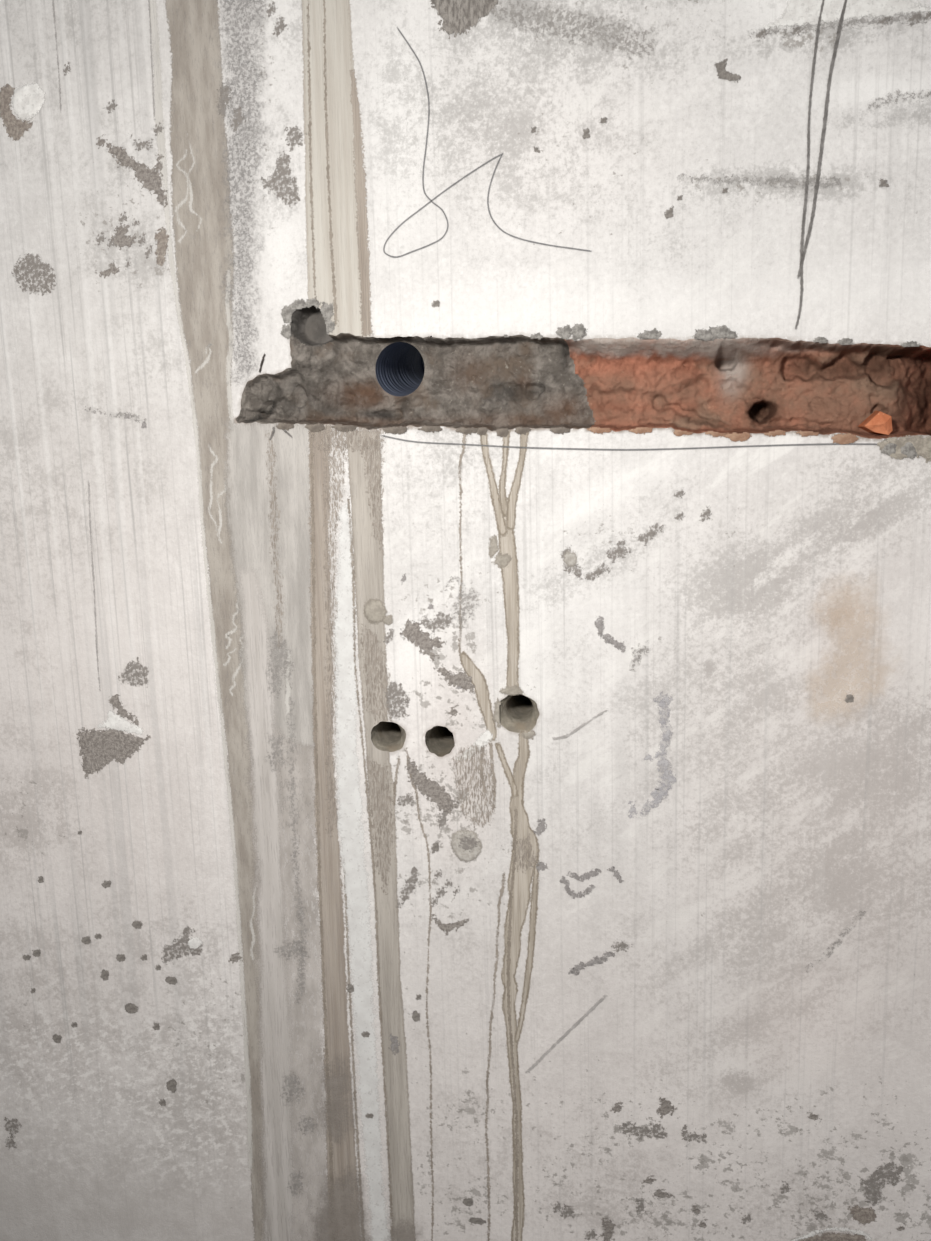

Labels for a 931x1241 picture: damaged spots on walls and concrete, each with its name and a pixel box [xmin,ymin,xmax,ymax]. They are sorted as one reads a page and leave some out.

peeling [431,0,654,59]
peeling [0,83,45,141]
peeling [96,123,169,207]
peeling [94,212,169,279]
peeling [280,298,335,339]
flaking render [530,323,931,459]
peeling [561,491,685,580]
water stain [148,0,434,1241]
peeling [383,576,477,694]
peeling [76,657,151,779]
peeling [610,1097,677,1140]
peeling [791,1161,903,1241]